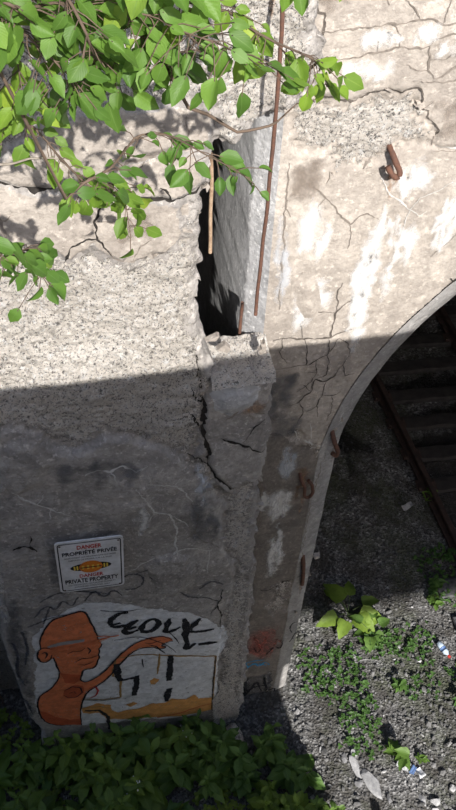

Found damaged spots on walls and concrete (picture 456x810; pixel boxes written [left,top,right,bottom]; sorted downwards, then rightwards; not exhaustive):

spalling [0,33,71,105]
spalling [146,80,172,98]
spalling [180,0,435,183]
crack [317,0,456,152]
crack [0,181,52,195]
crack [63,185,204,268]
crack [279,163,291,310]
crack [313,186,379,249]
spalling [0,203,231,456]
crack [173,355,271,490]
crack [274,283,353,457]
spalling [212,681,241,724]